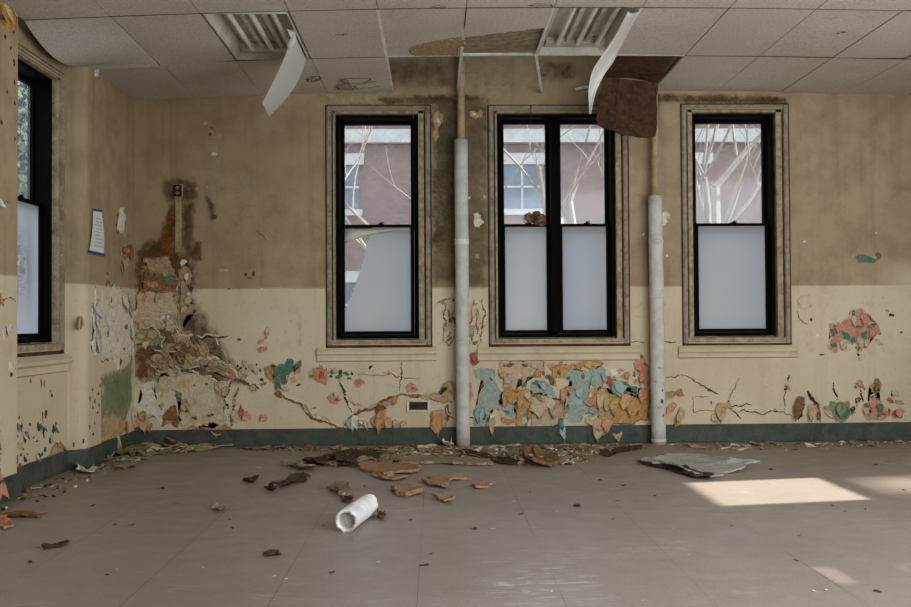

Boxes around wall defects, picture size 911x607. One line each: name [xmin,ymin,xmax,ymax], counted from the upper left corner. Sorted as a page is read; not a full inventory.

peeling [410,38,464,56]
peeling [17,207,365,467]
crack [128,265,474,429]
peeling [437,297,456,346]
peeling [469,299,651,443]
peeling [820,307,883,360]
peeling [405,381,456,437]
peeling [665,388,685,427]
crack [665,373,795,419]
peeling [792,377,906,423]
peeling [0,474,10,501]